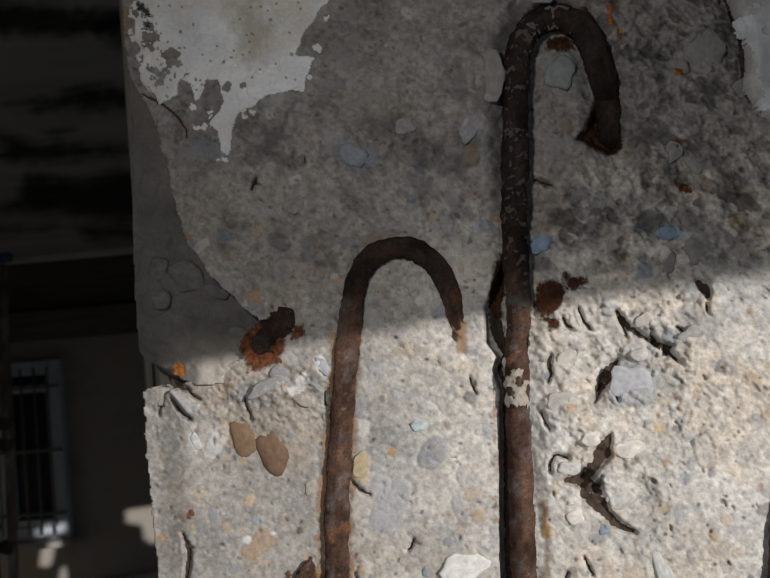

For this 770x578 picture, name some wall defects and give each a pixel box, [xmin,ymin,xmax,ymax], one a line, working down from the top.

corrosion [547,36,574,52]
corrosion [523,2,622,38]
corrosion [575,97,623,155]
spalling [121,0,545,578]
corrosion [488,253,506,318]
spalling [500,4,621,578]
corrosion [533,271,589,331]
spalling [527,0,770,578]
corrosion [237,315,305,373]
corrosion [456,322,468,352]
corrosion [308,333,337,578]